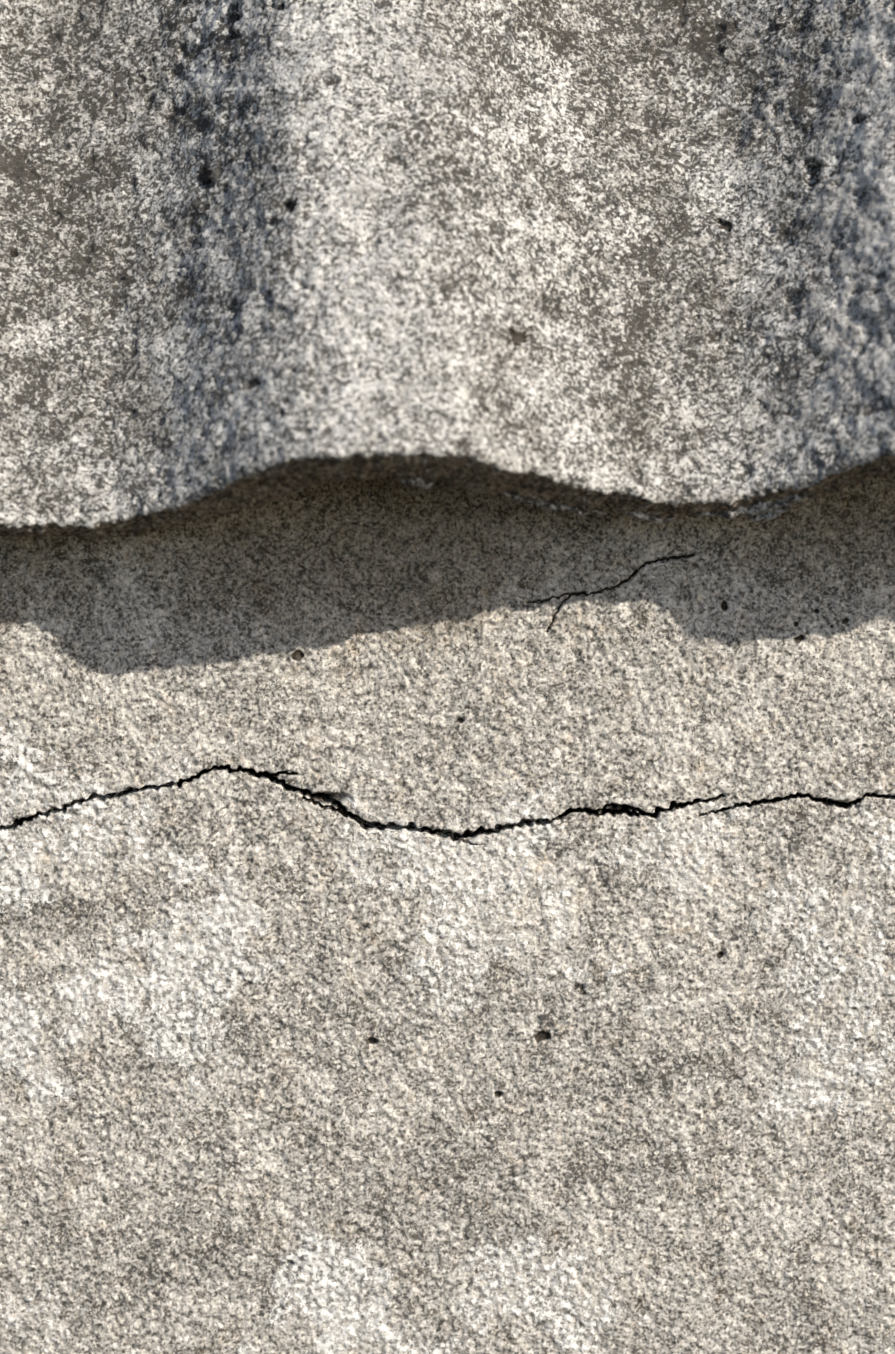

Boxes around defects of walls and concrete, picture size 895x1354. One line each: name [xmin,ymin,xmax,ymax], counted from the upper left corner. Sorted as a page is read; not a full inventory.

crack [527,553,695,632]
crack [0,764,895,846]